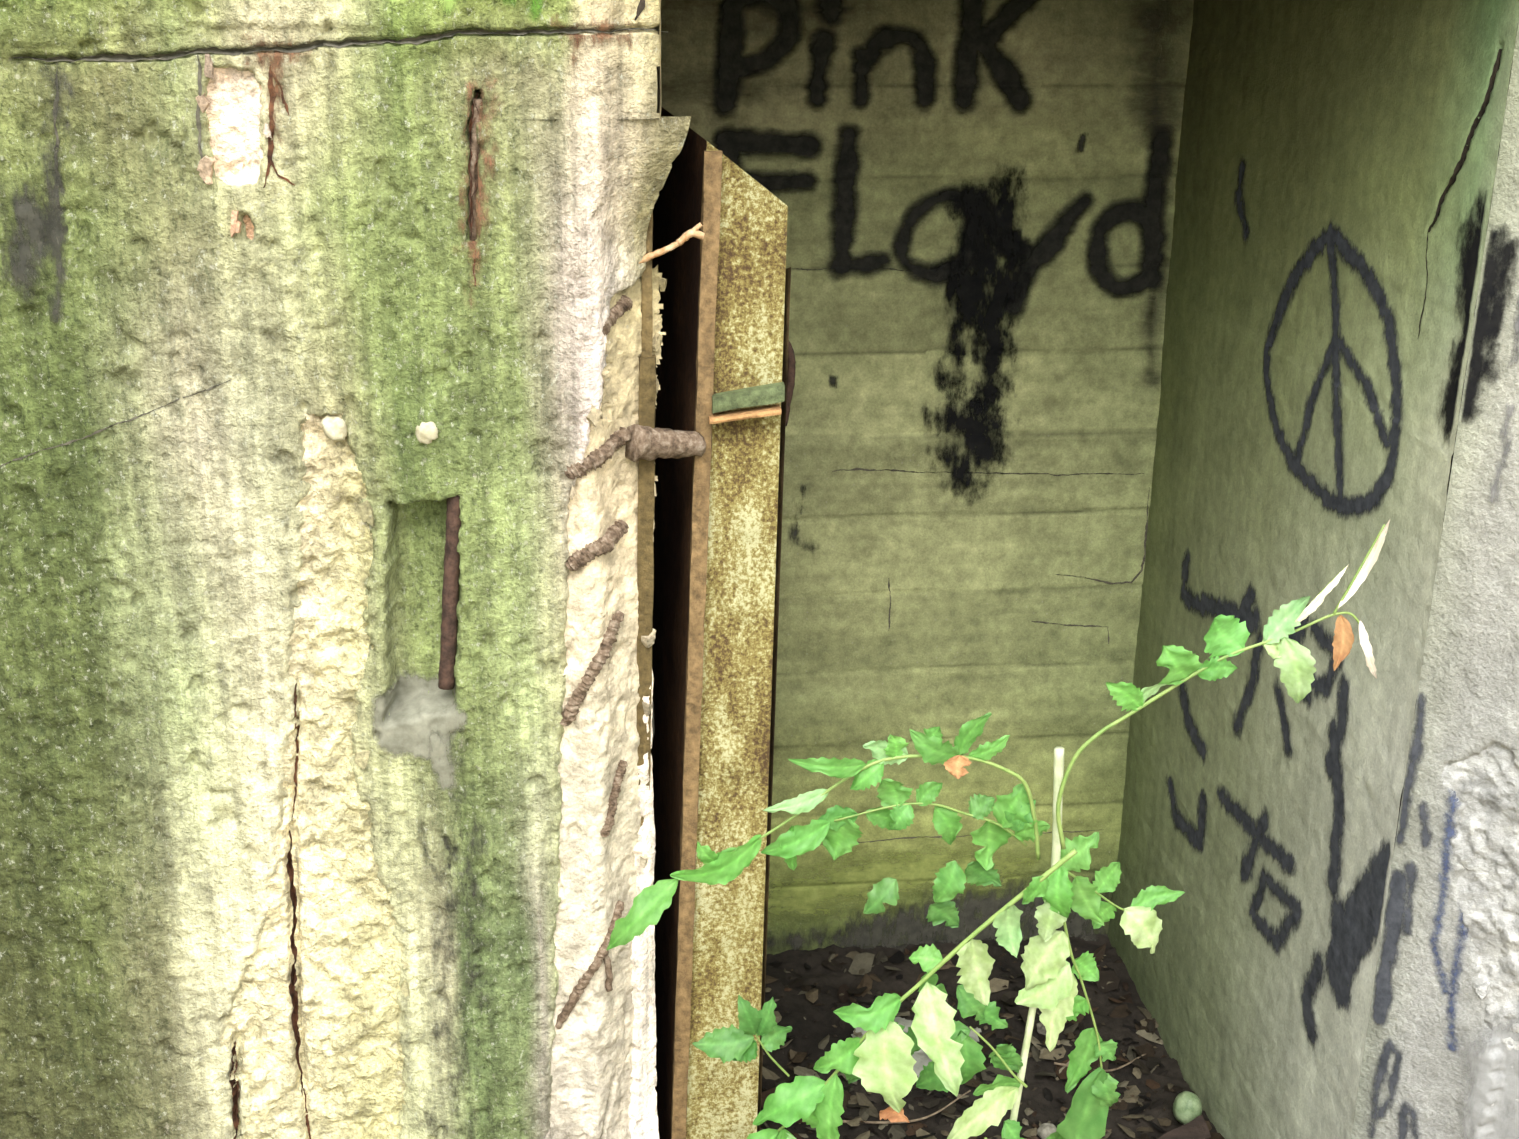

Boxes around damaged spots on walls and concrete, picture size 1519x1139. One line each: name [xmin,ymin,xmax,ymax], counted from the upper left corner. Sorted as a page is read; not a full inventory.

spalling [195,53,272,186]
spalling [230,210,254,240]
rust [246,41,310,138]
crack [13,0,667,213]
rust [458,80,497,283]
crack [286,683,311,1139]
crack [229,1040,240,1139]